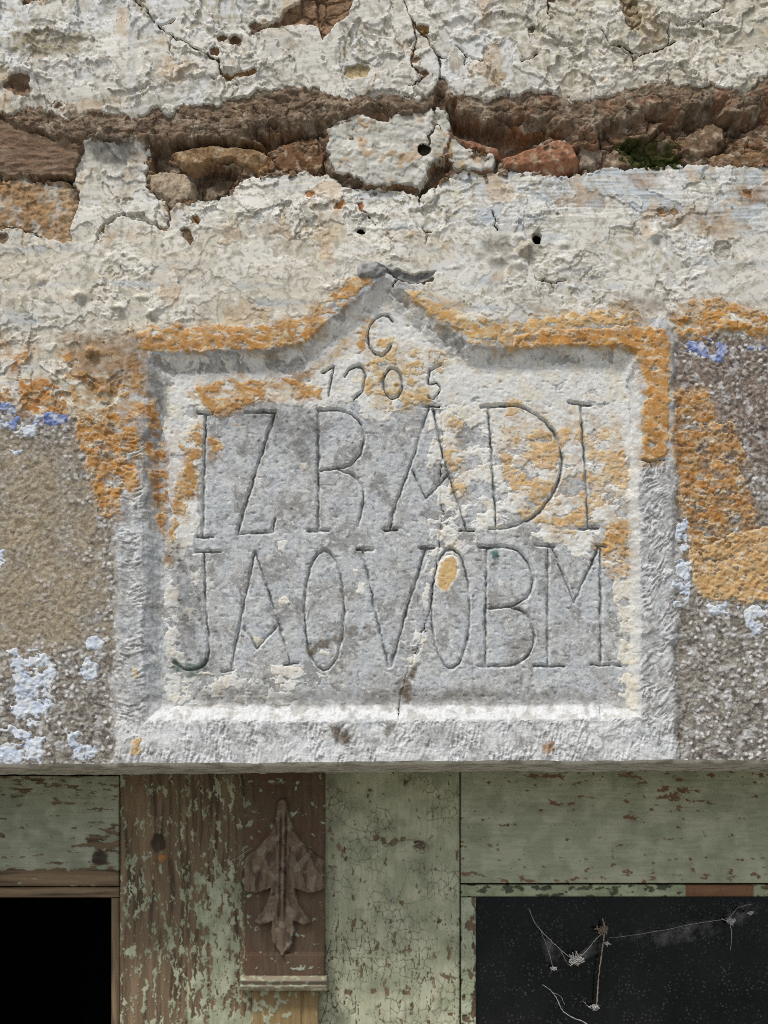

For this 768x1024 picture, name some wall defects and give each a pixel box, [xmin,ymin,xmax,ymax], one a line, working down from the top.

crack [135,1,223,74]
crack [404,0,481,86]
spalling [0,54,768,245]
peeling [0,270,768,711]
peeling [0,648,57,764]
peeling [65,731,97,761]
peeling [130,737,142,756]